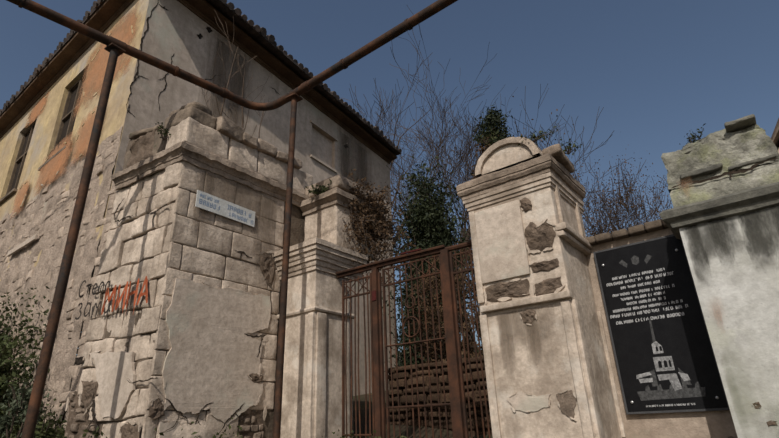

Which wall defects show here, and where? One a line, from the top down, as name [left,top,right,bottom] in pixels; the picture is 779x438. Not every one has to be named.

peeling [75,12,137,112]
crack [126,2,174,117]
peeling [12,108,96,216]
spalling [519,196,532,212]
crack [672,158,778,188]
spalling [484,218,565,305]
damp [687,205,779,277]
peeling [64,250,276,438]
crack [244,333,267,357]
crack [165,398,211,431]
crack [219,402,246,433]
peeling [507,390,577,421]